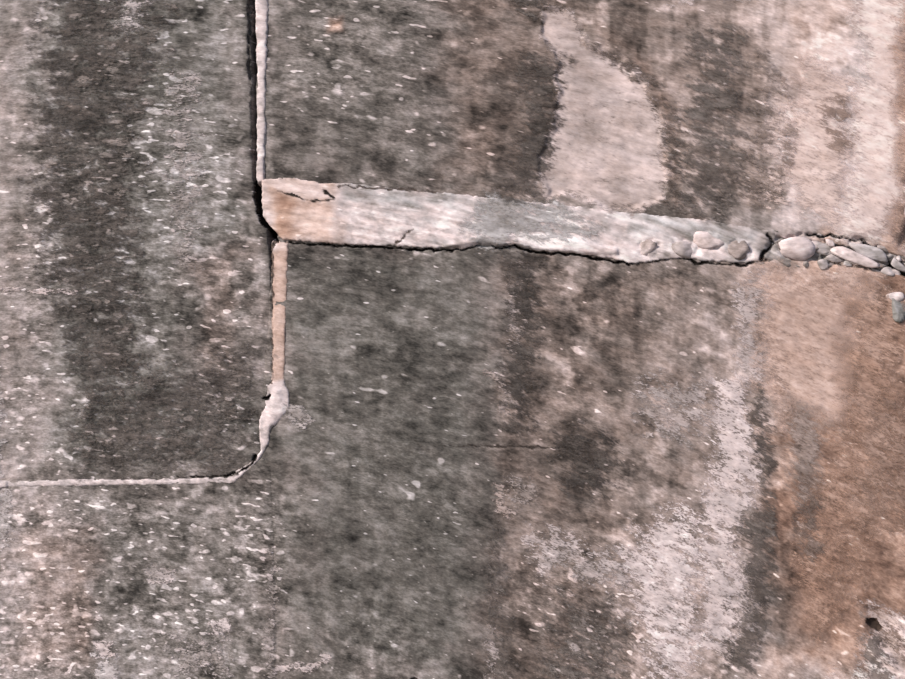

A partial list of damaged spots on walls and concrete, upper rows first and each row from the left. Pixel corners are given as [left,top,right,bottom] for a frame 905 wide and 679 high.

damp [0,0,269,481]
crack [246,0,775,317]
damp [484,246,547,437]
crack [806,233,871,267]
crack [176,454,257,479]
damp [520,268,779,679]
damp [482,475,538,679]